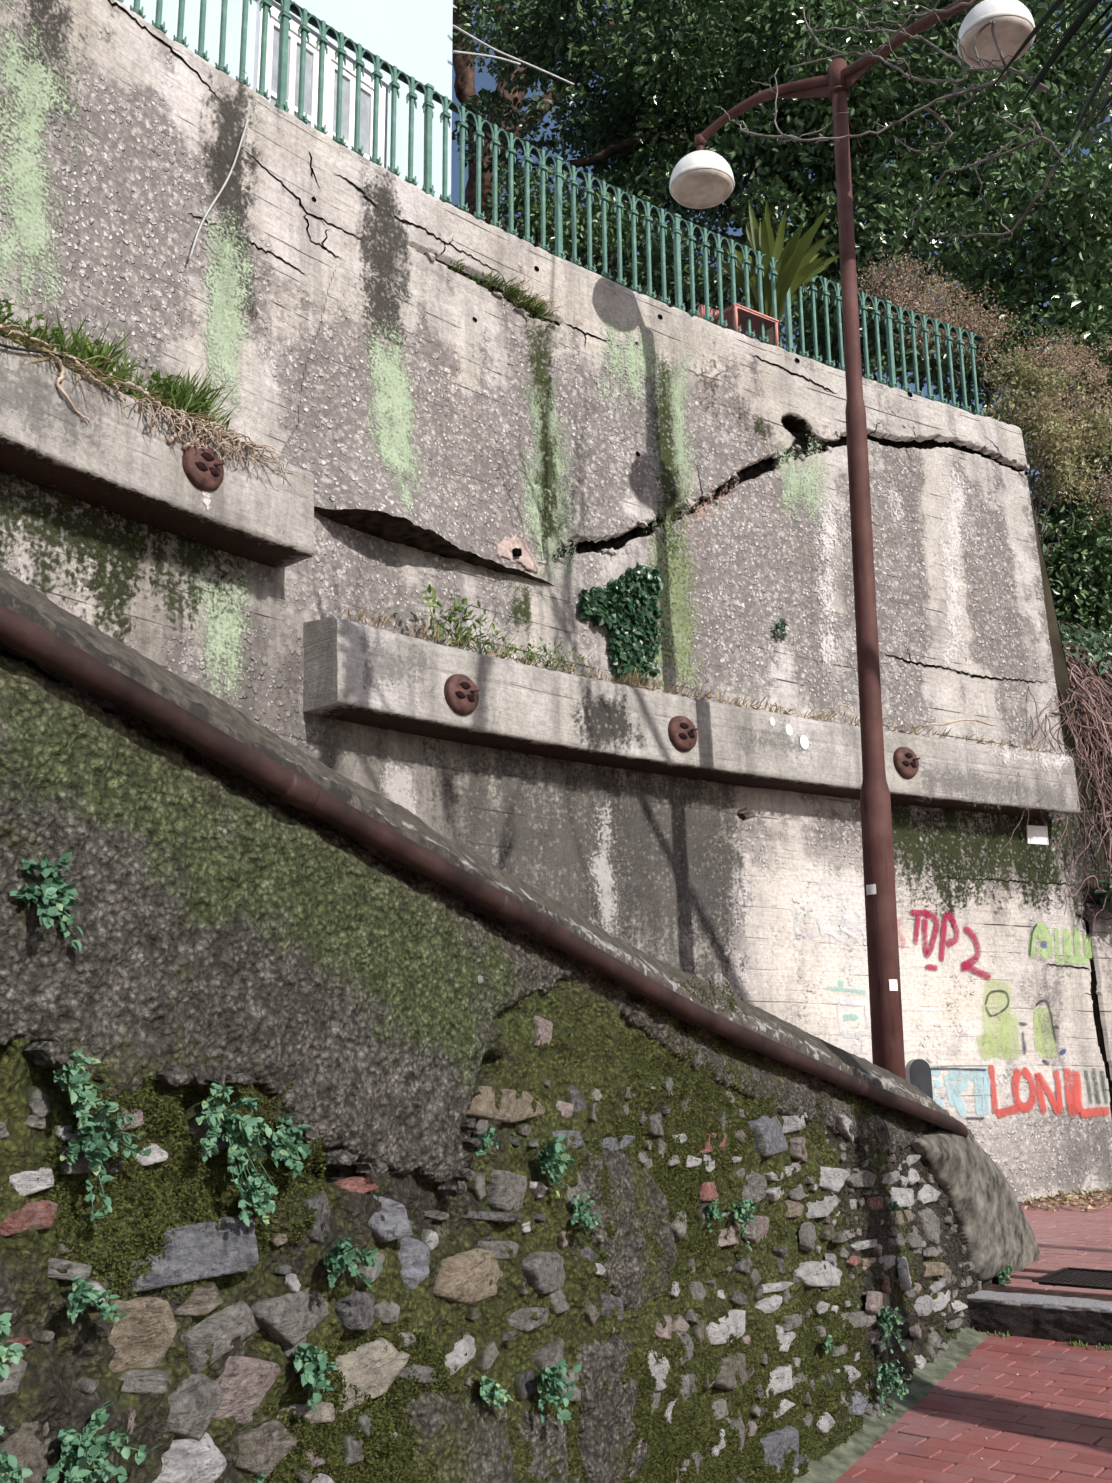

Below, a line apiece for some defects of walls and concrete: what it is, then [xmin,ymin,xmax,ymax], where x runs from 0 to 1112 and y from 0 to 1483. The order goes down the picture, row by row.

damp [0,0,85,165]
damp [199,70,262,337]
damp [356,169,412,360]
crack [187,149,625,350]
crack [750,354,838,394]
crack [539,423,1030,568]
damp [73,522,155,646]
damp [932,850,971,927]
damp [1021,804,1103,926]
crack [926,874,1112,1118]
peeling [580,1148,678,1311]
peeling [405,1335,648,1483]